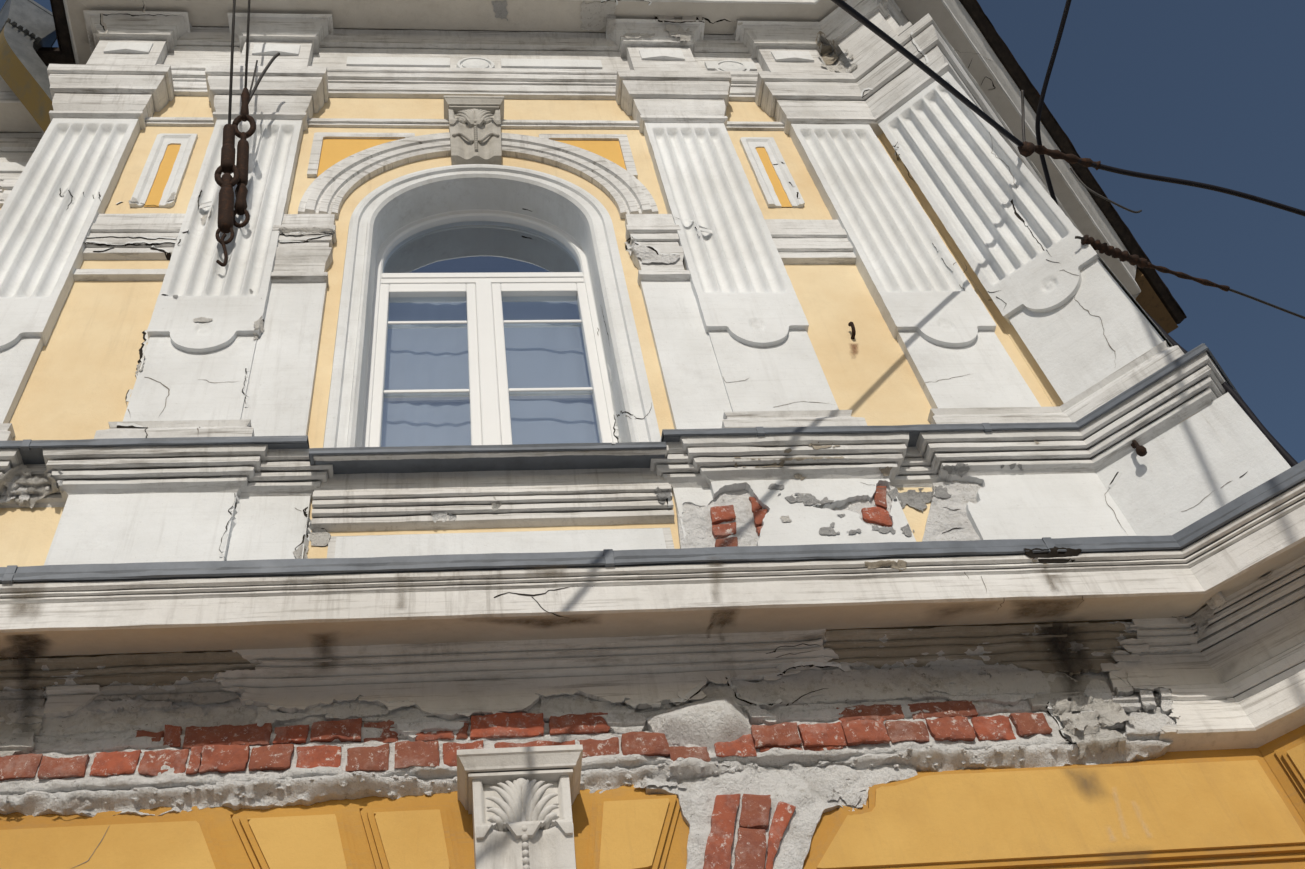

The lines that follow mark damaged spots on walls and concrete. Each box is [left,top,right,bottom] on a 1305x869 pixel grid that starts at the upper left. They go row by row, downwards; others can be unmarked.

crack [989,132,1116,366]
crack [117,368,250,438]
spalling [654,442,983,549]
crack [1105,472,1125,531]
crack [494,585,595,618]
leakage [0,635,46,675]
leakage [1020,602,1081,683]
spalling [0,621,1194,869]